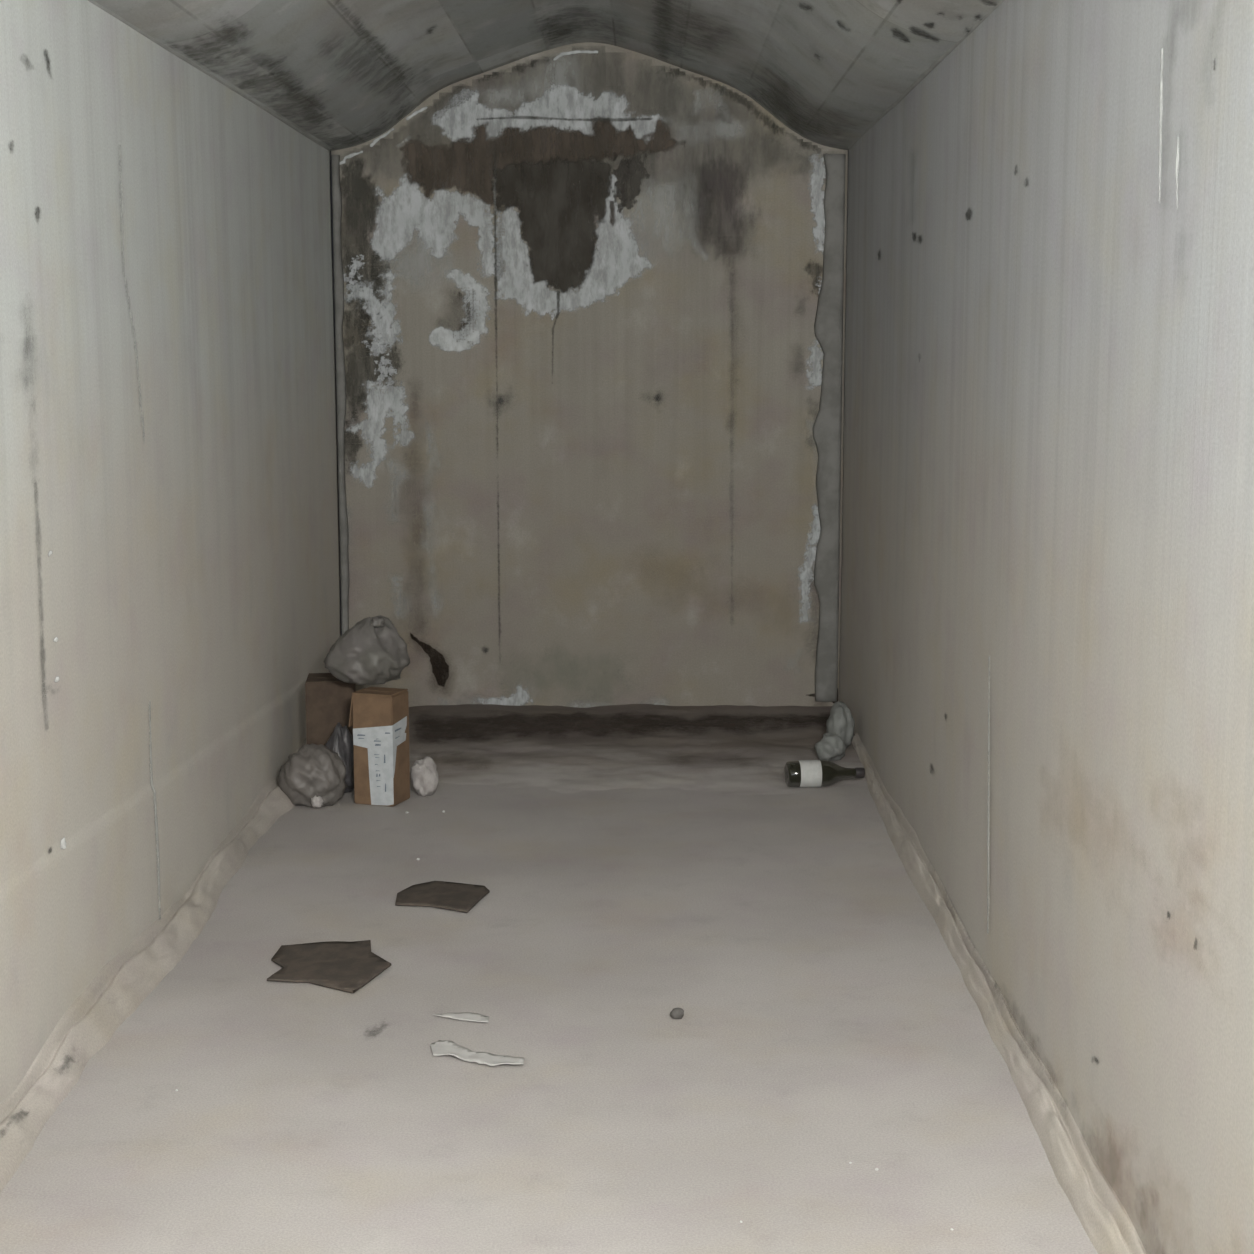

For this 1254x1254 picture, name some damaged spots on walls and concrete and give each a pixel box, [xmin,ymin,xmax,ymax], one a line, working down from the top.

leakage [340,50,827,488]
leakage [798,505,821,622]